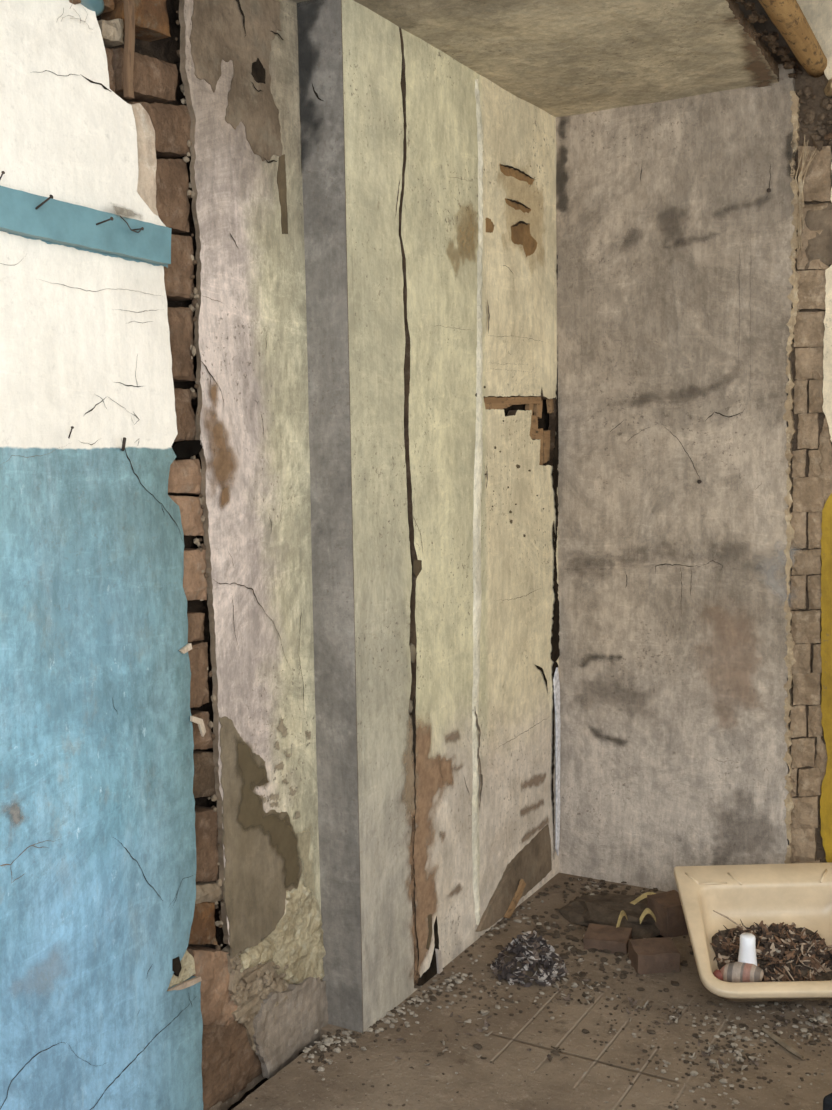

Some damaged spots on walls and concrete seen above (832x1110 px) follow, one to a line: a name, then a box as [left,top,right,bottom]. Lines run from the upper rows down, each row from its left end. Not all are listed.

flaking render [499,164,534,185]
flaking render [505,198,537,258]
crack [85,354,182,539]
flaking render [777,57,832,864]
flaking render [96,0,326,1110]
crack [411,514,423,578]
crack [409,643,417,663]
crack [408,696,419,975]
flaking render [414,914,443,986]
crack [0,993,196,1110]